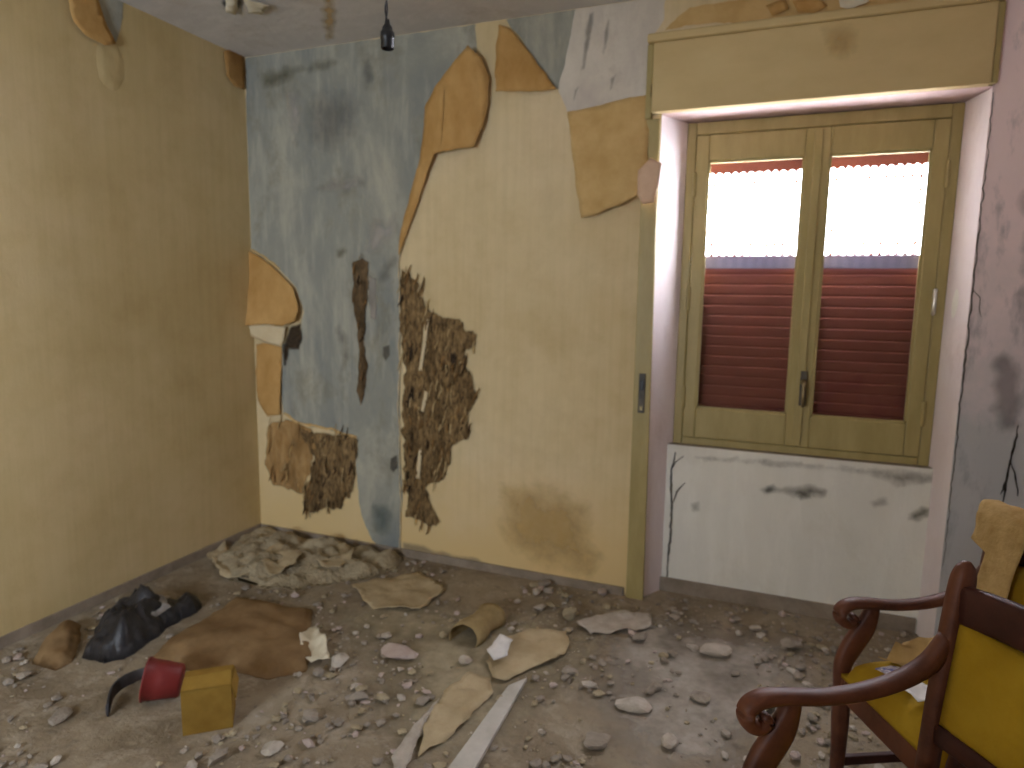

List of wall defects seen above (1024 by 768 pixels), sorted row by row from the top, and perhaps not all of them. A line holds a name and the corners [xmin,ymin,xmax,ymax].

spalling [351,254,369,405]
spalling [397,265,479,535]
spalling [267,416,358,520]
crack [666,452,685,577]
crack [1000,425,1019,502]